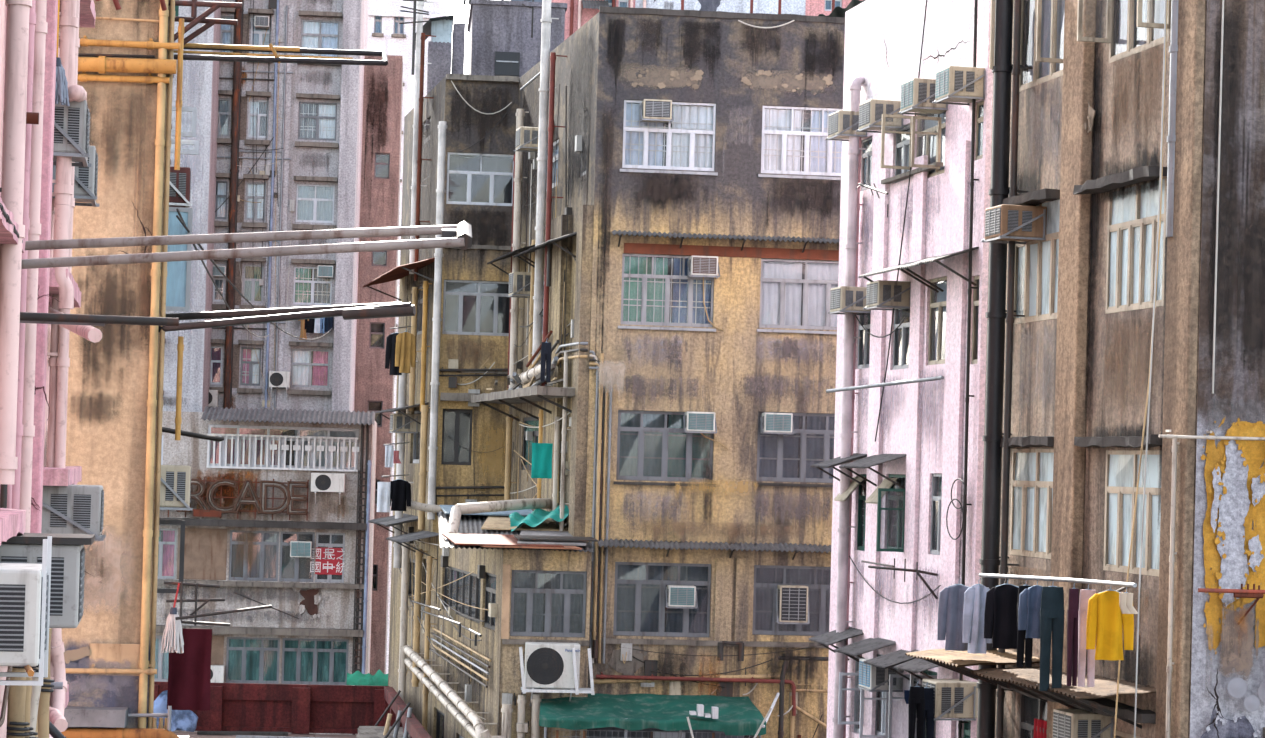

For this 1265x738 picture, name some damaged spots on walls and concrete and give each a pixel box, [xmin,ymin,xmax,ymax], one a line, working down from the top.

damp [607,19,667,87]
peeling [623,64,704,90]
damp [679,21,720,74]
damp [742,25,780,61]
crack [925,40,970,65]
damp [568,29,613,307]
damp [637,174,705,208]
damp [79,263,151,371]
damp [596,321,698,402]
corrosion [197,471,256,511]
peeling [1201,417,1265,680]
peeling [1200,706,1261,738]